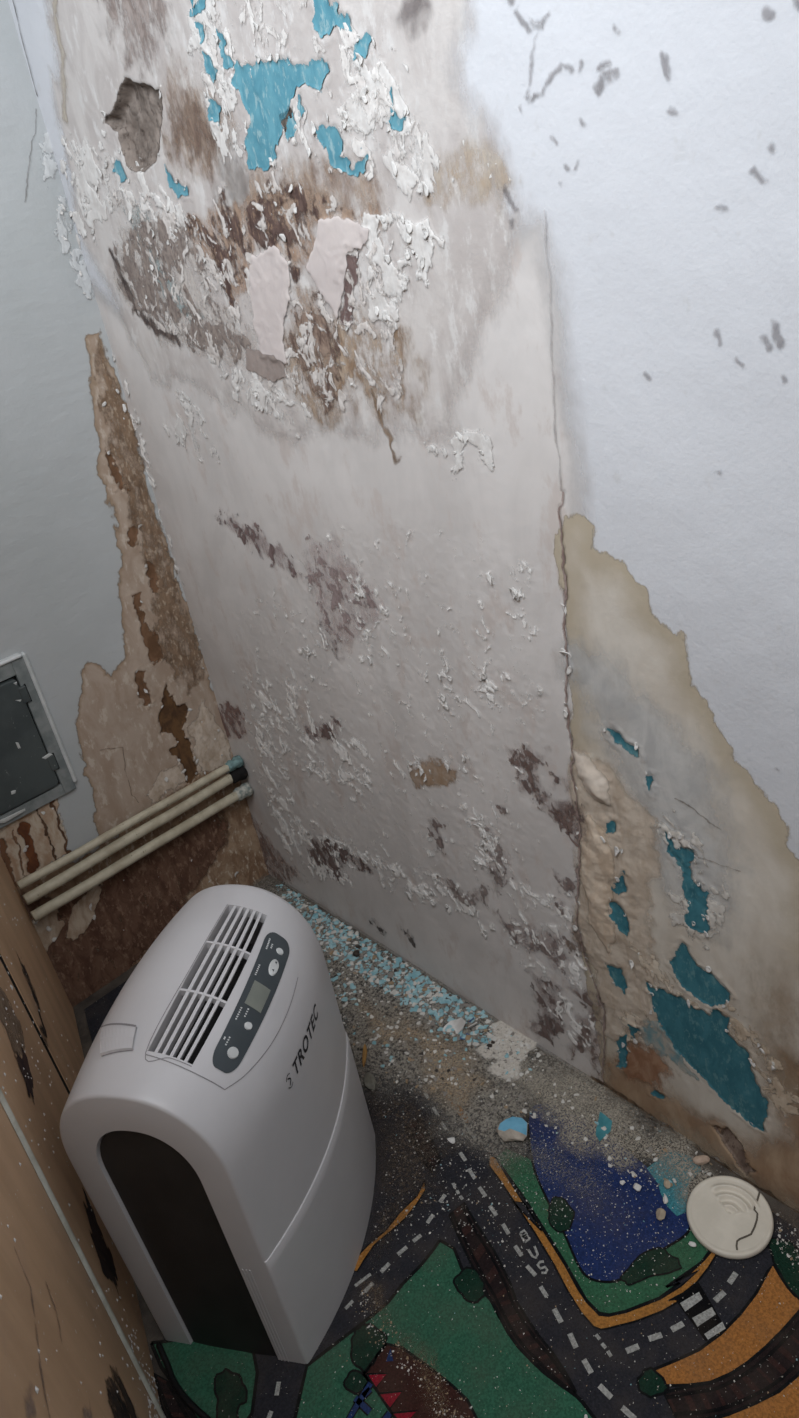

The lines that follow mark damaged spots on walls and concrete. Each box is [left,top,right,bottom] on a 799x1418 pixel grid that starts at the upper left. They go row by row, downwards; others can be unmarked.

spalling [39,0,445,439]
peeling [105,450,131,492]
leakage [16,0,799,1091]
spalling [132,561,231,803]
peeling [603,728,653,790]
peeling [32,883,104,952]
peeling [609,870,629,937]
peeling [605,963,627,995]
peeling [646,832,768,1131]
leakage [600,1033,799,1212]
leakage [82,1187,119,1294]
leakage [106,1366,137,1418]